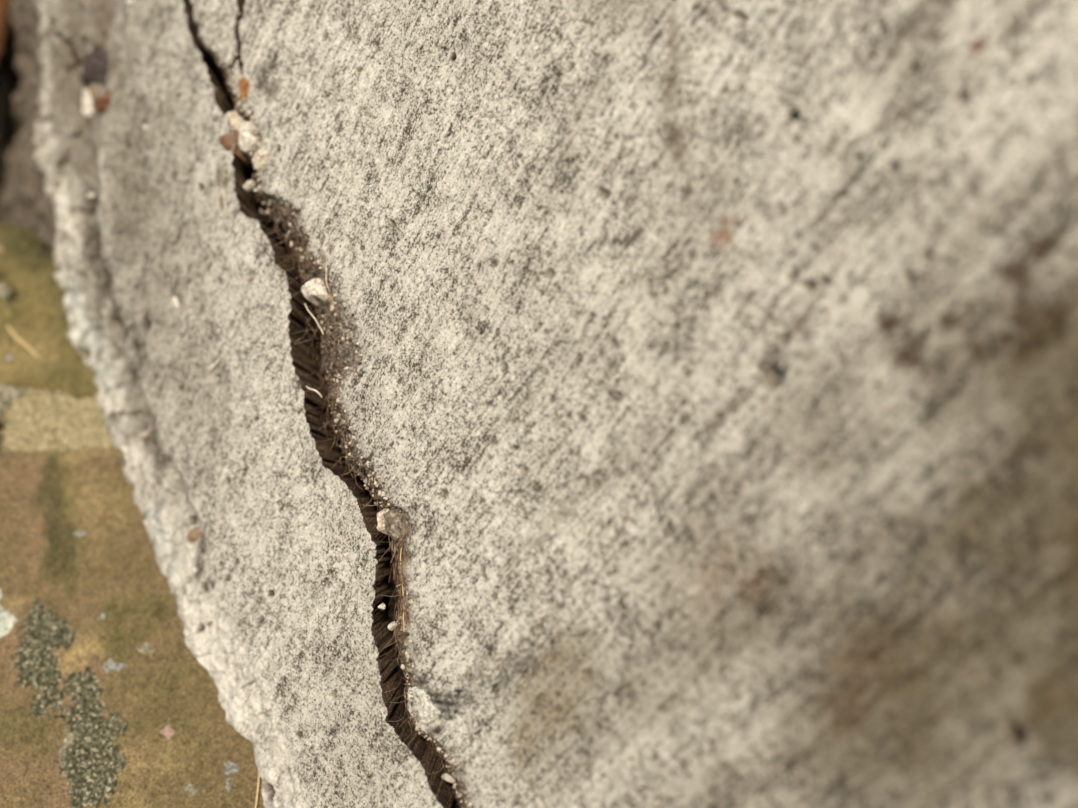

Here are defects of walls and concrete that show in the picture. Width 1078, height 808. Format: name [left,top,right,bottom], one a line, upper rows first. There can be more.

crack [182,0,460,808]